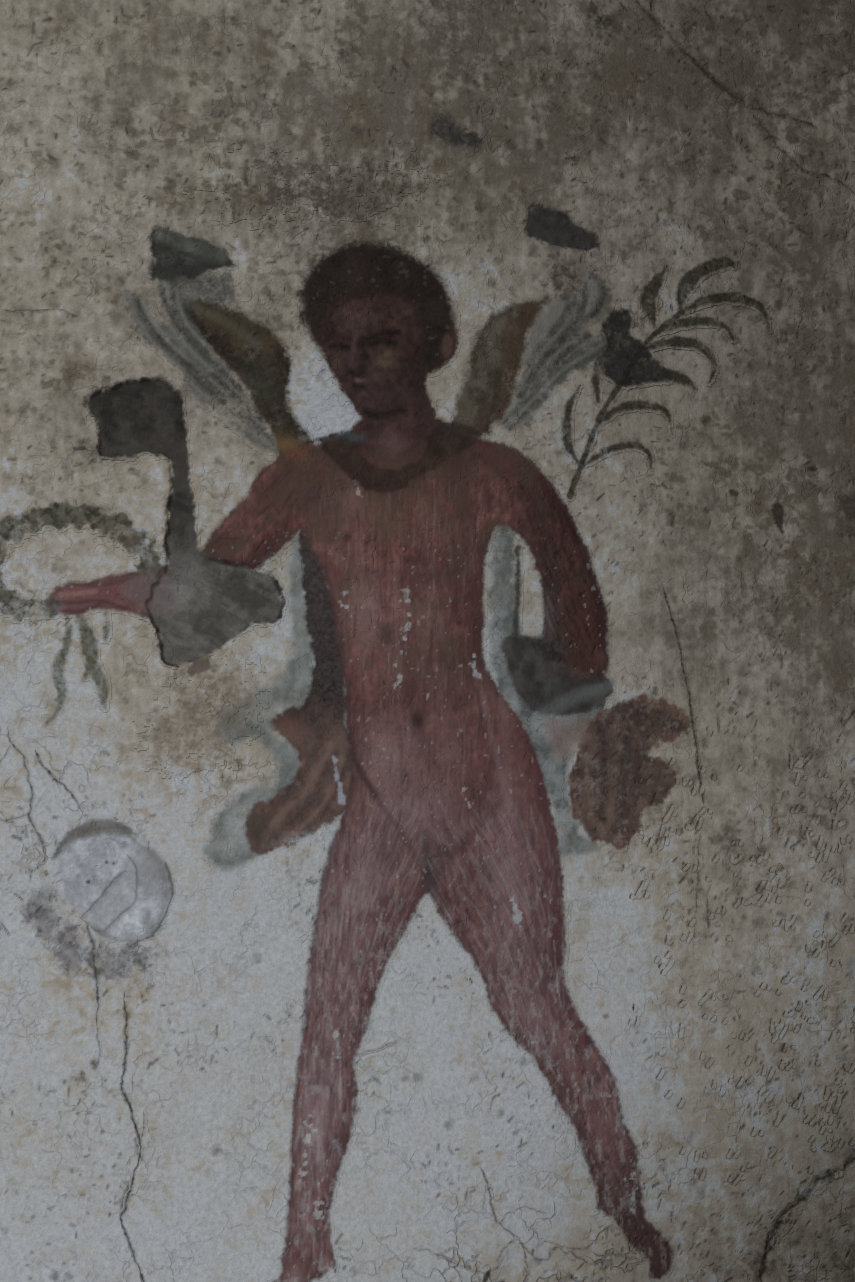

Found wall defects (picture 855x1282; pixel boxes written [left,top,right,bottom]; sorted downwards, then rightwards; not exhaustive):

crack [634,0,855,196]
flaking render [145,222,238,285]
flaking render [524,202,604,253]
flaking render [70,374,288,669]
crack [80,854,176,1282]
crack [756,1145,855,1282]